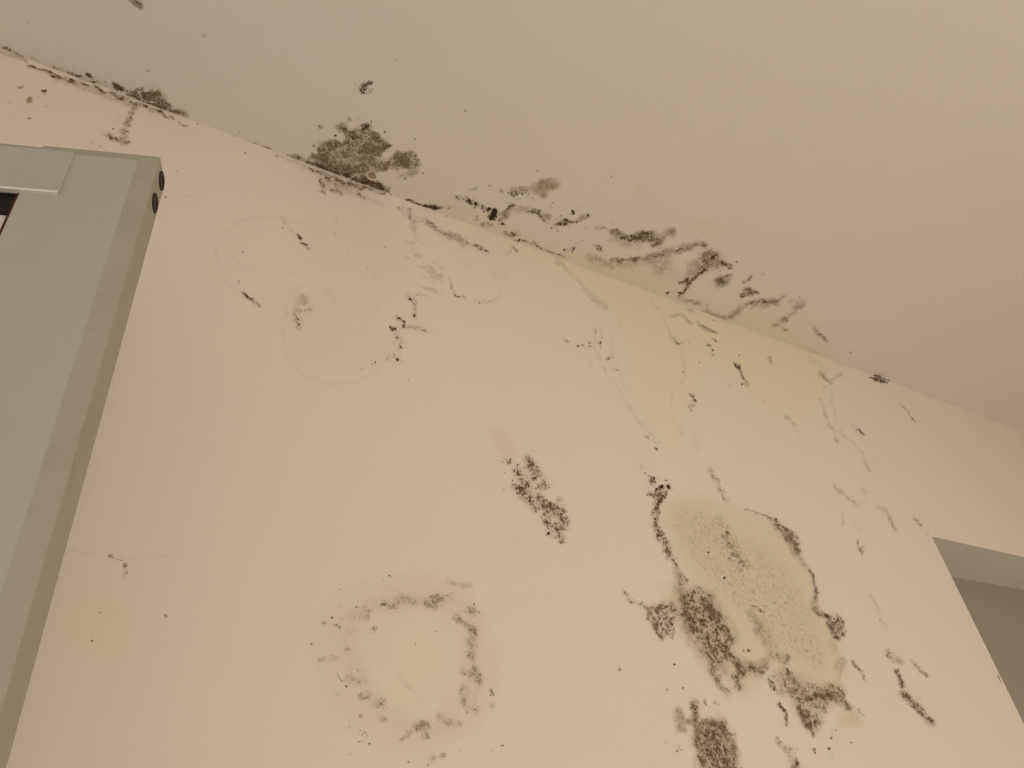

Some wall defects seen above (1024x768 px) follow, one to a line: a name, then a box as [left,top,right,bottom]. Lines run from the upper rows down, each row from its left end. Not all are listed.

leakage [91,82,198,146]
leakage [287,119,424,196]
leakage [398,171,851,456]
leakage [486,423,569,544]
leakage [307,567,504,766]
leakage [677,701,737,768]
leakage [624,470,868,754]
leakage [895,669,934,724]